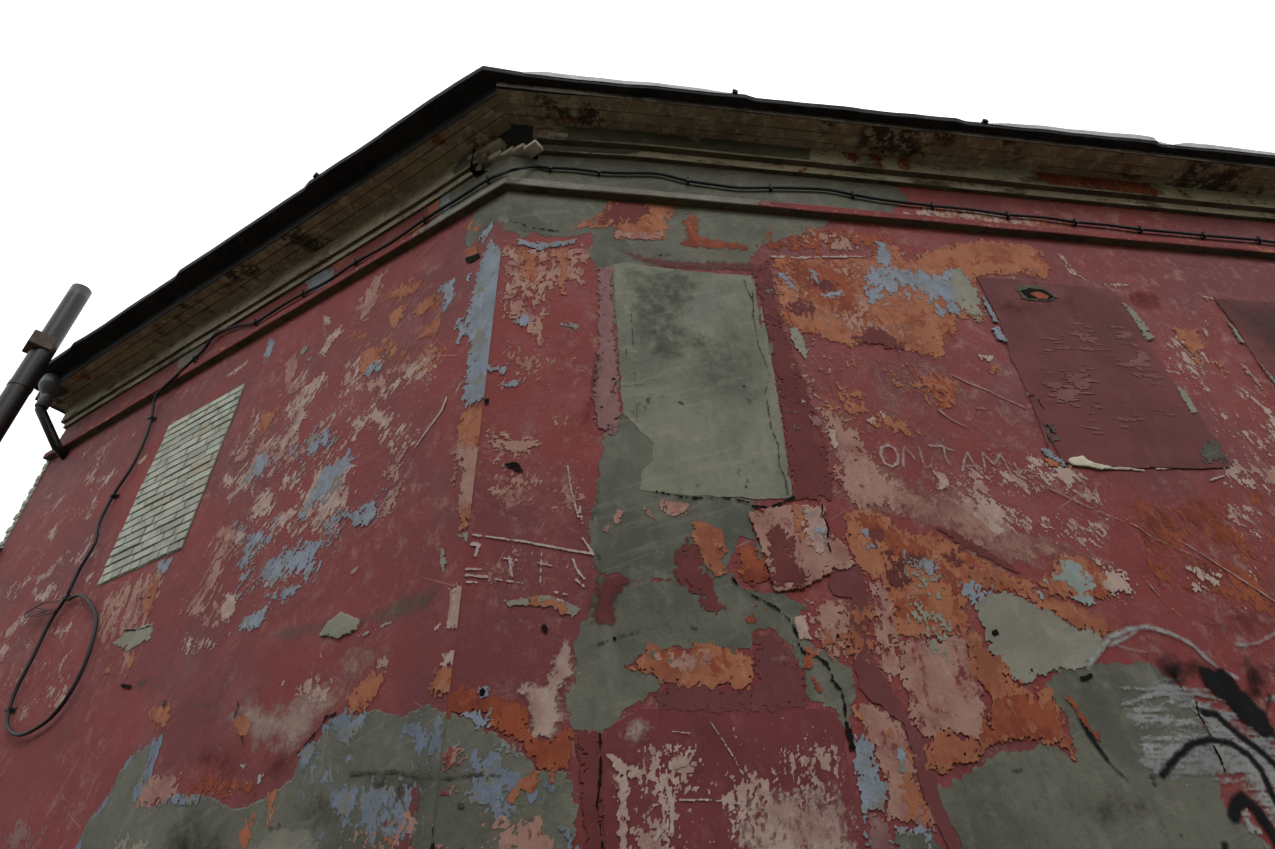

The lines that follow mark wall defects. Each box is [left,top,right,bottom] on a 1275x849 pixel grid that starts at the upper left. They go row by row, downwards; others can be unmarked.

crack [656,279,856,750]
crack [348,769,502,808]
crack [596,732,604,849]